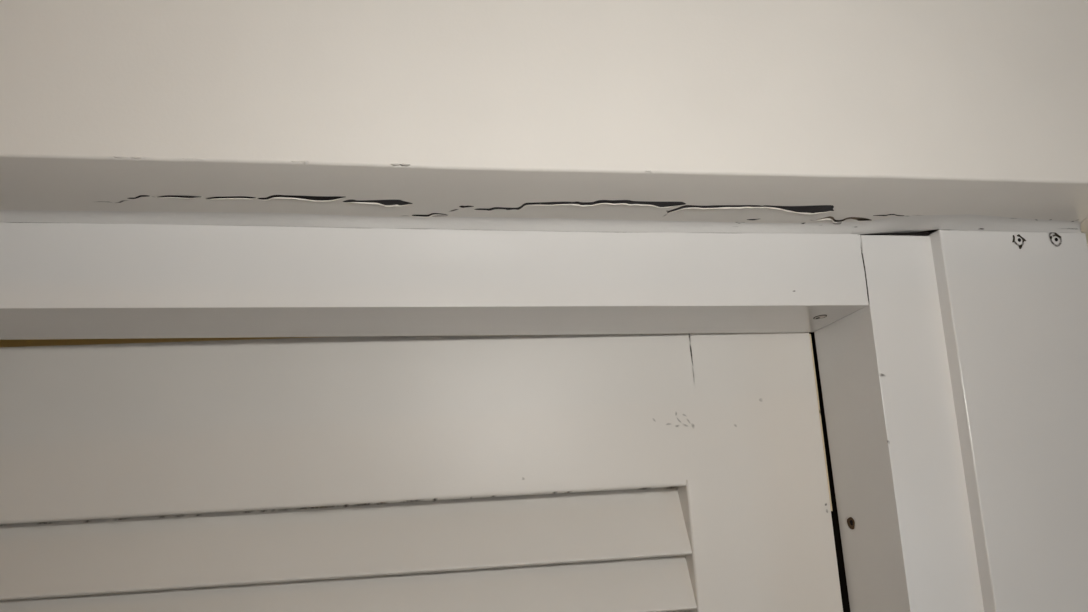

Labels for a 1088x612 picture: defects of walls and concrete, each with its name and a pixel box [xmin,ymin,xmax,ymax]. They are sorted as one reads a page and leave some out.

crack [117,195,930,301]